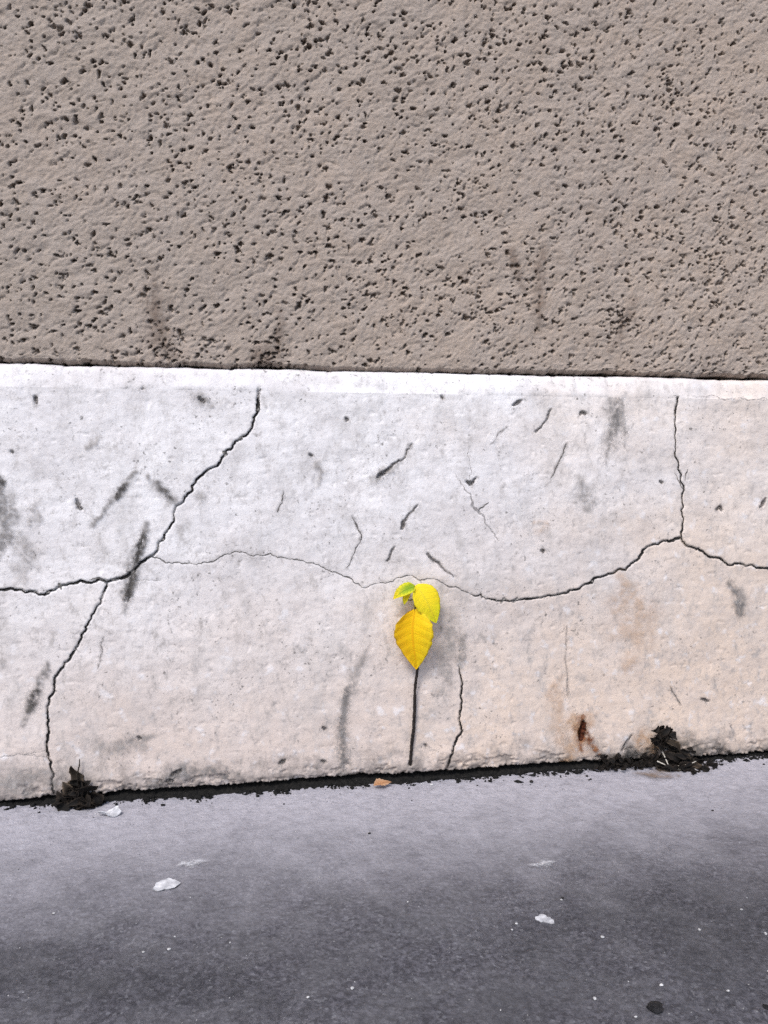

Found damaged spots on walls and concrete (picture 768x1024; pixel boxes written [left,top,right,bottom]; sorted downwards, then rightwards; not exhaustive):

crack [0,390,768,796]
corrosion [552,700,599,761]